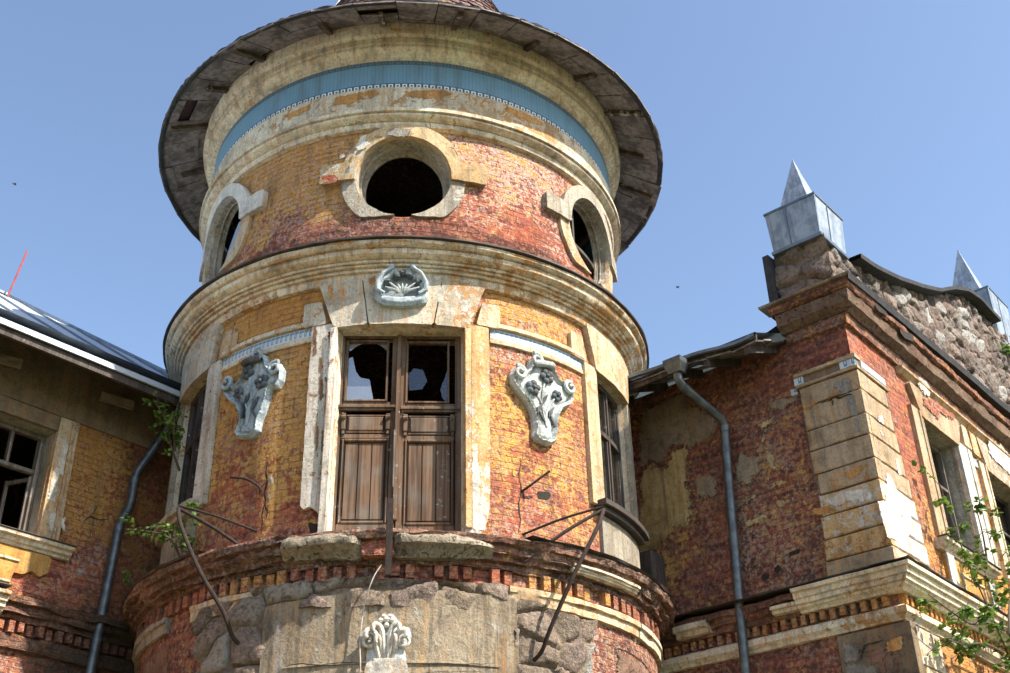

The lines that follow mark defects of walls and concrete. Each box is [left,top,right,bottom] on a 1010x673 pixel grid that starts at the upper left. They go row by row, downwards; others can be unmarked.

peeling [284,106,310,120]
peeling [333,90,379,105]
flaking render [387,127,410,137]
peeling [405,90,452,99]
peeling [506,107,542,126]
peeling [313,326,330,473]
peeling [472,431,486,533]
peeling [638,394,717,552]
peeling [735,396,818,505]
flaking render [0,543,170,673]